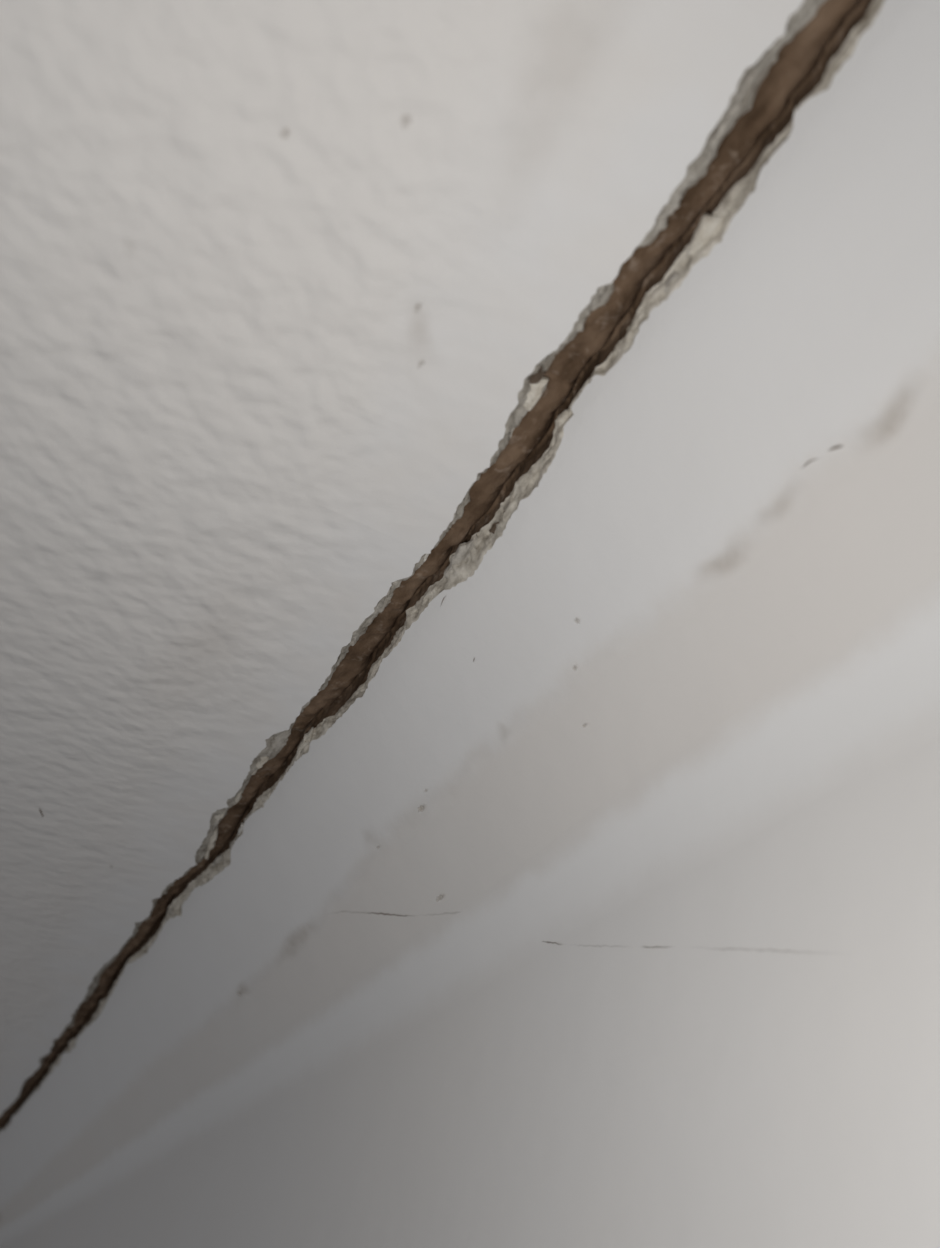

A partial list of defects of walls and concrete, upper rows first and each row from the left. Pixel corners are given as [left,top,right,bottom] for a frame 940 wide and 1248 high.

crack [635,0,826,249]
crack [793,0,885,118]
crack [238,119,793,834]
crack [195,731,284,864]
crack [13,843,234,1116]